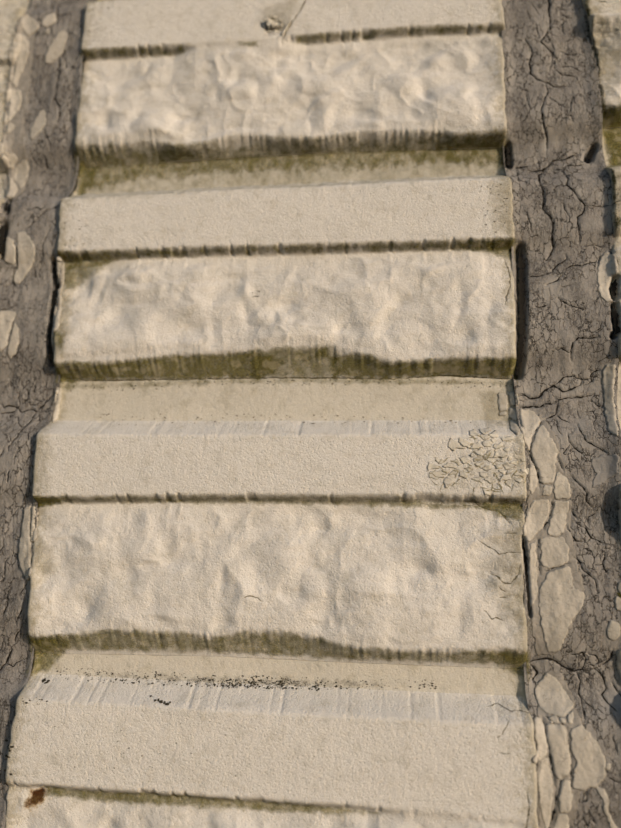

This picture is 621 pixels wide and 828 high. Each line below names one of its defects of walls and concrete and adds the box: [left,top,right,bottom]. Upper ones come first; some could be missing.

peeling [0,13,68,202]
peeling [4,231,36,284]
crack [0,0,618,488]
peeling [597,252,619,302]
damp [192,347,518,388]
crack [474,260,620,621]
damp [26,636,385,691]
damp [483,651,528,673]
crack [529,651,621,719]
rust [25,788,46,808]
crack [491,703,595,825]
peeling [531,671,611,828]